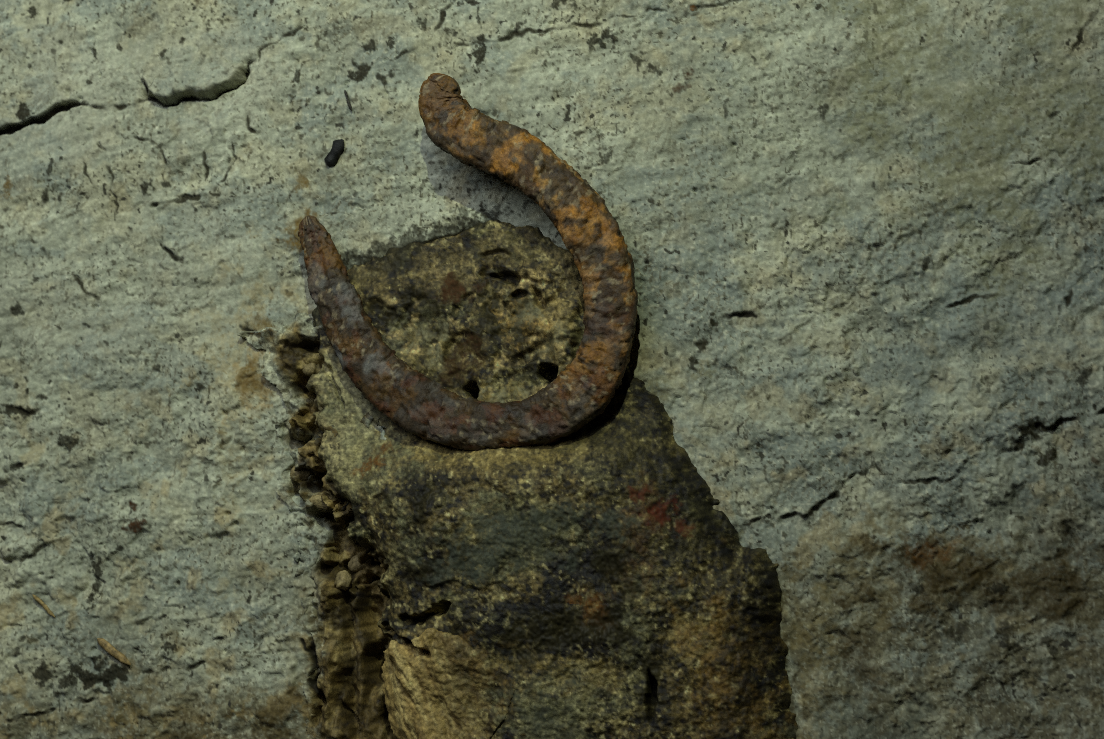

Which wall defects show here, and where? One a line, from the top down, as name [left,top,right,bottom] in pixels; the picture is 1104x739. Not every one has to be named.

crack [0,26,303,136]
spalling [689,312,718,370]
crack [1050,409,1104,428]
crack [743,462,966,525]
spalling [237,313,514,739]